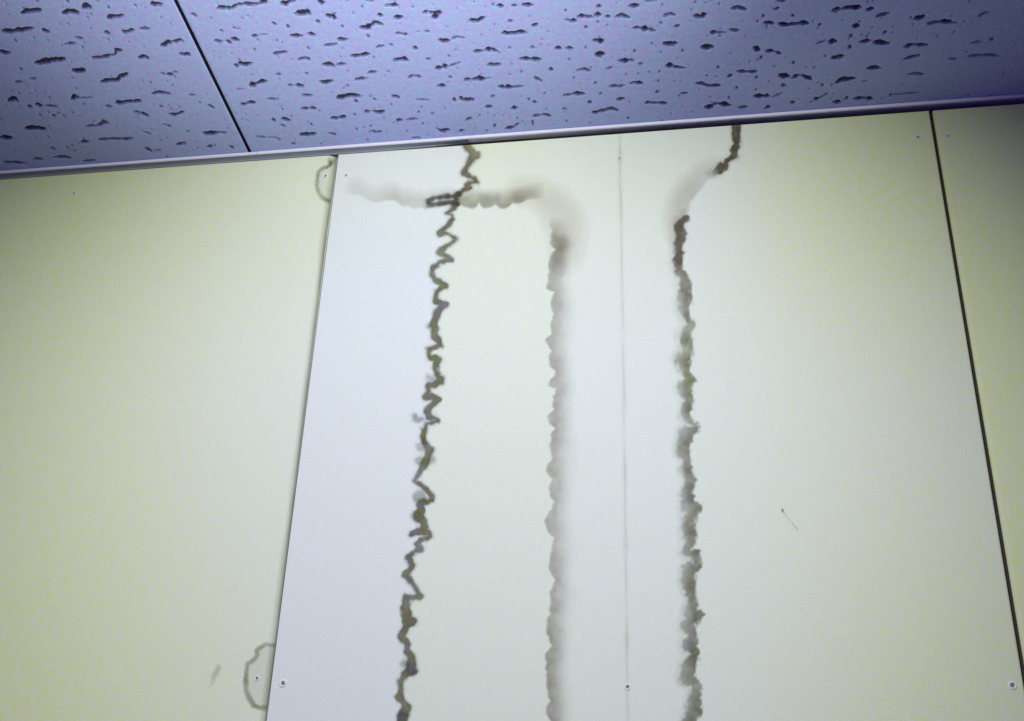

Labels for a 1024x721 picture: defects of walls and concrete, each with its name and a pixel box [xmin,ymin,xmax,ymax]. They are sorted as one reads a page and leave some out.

water stain [395,145,480,721]